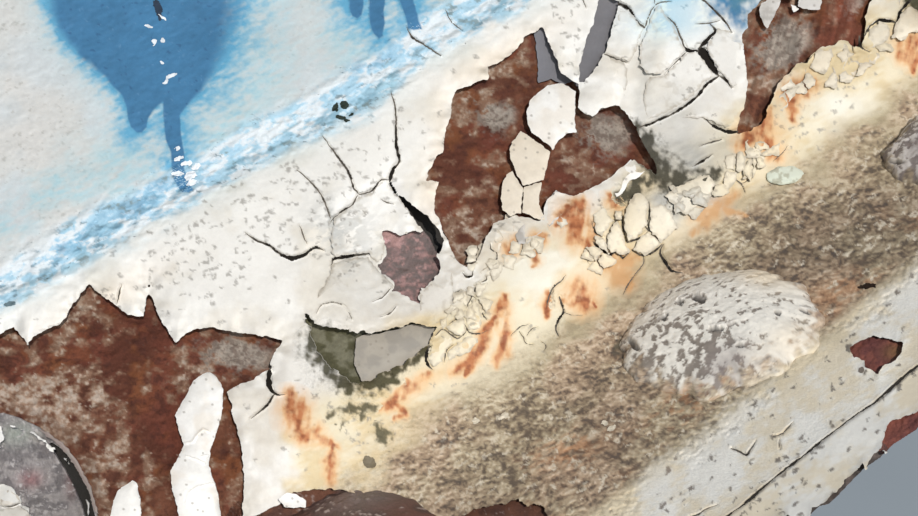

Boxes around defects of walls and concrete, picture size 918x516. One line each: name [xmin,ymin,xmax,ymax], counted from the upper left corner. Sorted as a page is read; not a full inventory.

crack [617,0,732,128]
crack [246,229,370,265]
crack [297,92,401,221]
rust [492,186,648,326]
peeling [305,0,918,384]
crack [586,203,682,294]
peeling [0,284,282,516]
peeling [256,488,342,516]
rust [267,381,344,490]
rust [375,290,519,424]
peeling [462,499,548,516]
peeling [811,411,918,514]